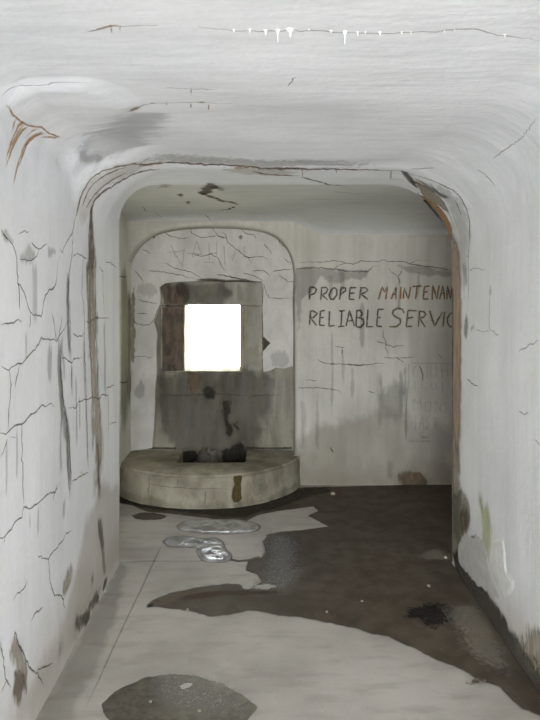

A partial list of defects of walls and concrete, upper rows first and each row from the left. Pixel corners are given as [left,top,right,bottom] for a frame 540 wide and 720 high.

rust [9,108,58,163]
spalling [402,171,452,241]
crack [2,162,470,463]
crack [1,465,89,541]
leakage [183,450,198,463]
leakage [221,374,247,463]
rust [232,475,242,502]
crack [38,531,71,607]
leakage [75,519,107,630]
leakage [119,472,540,715]
crack [1,633,52,692]
leakage [102,675,257,720]